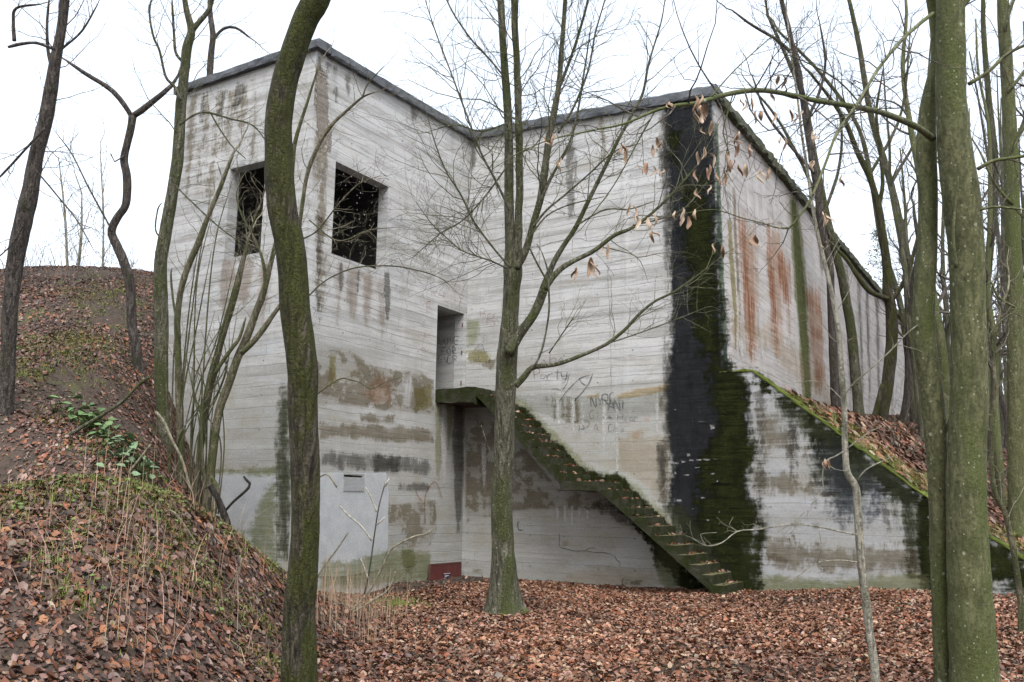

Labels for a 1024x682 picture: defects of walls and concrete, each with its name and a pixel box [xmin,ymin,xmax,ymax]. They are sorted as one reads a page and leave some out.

water stain [664,101,764,590]
water stain [613,504,708,590]
water stain [784,404,927,576]